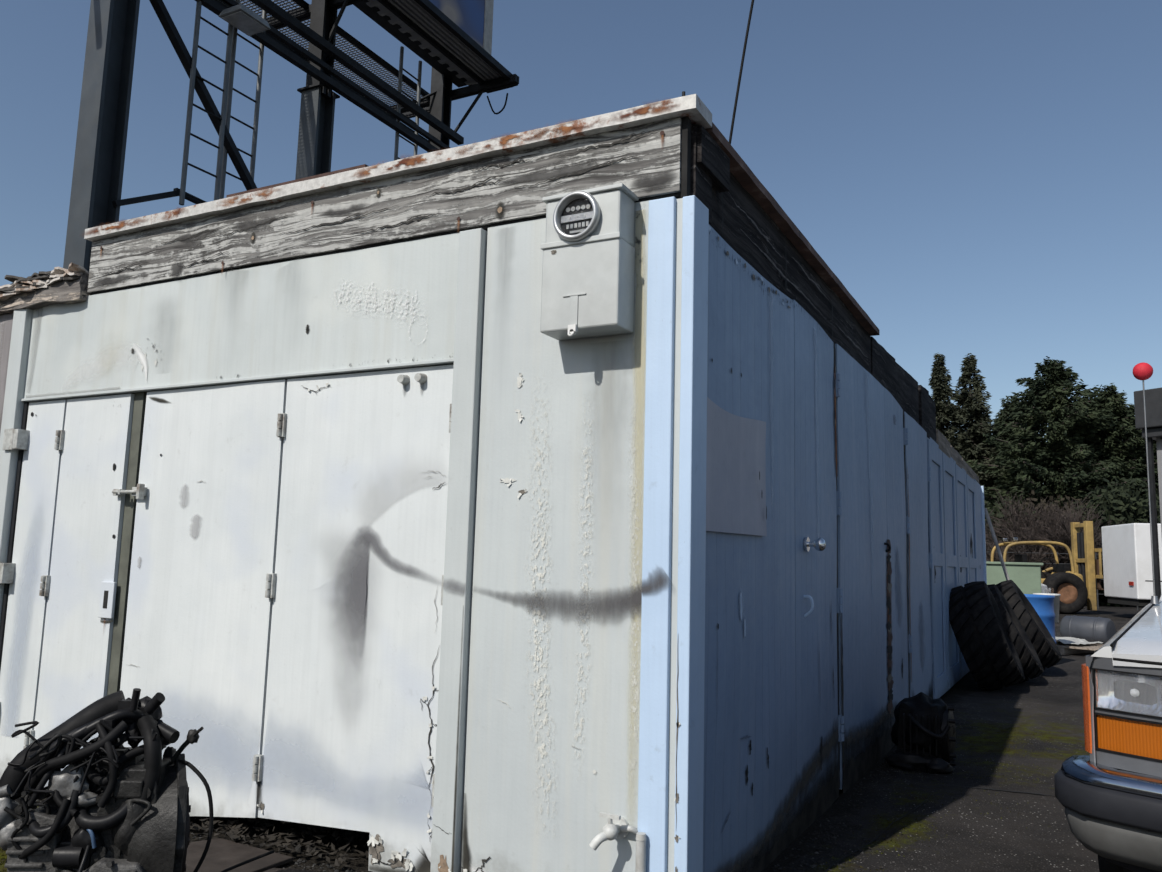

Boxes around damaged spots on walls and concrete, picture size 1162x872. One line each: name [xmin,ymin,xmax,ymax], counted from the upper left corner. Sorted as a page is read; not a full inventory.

rust [620,102,674,119]
rust [485,123,586,148]
rust [358,153,441,176]
crack [420,586,452,840]
water stain [723,707,895,872]
peeling [367,834,413,871]
peeling [438,855,491,872]